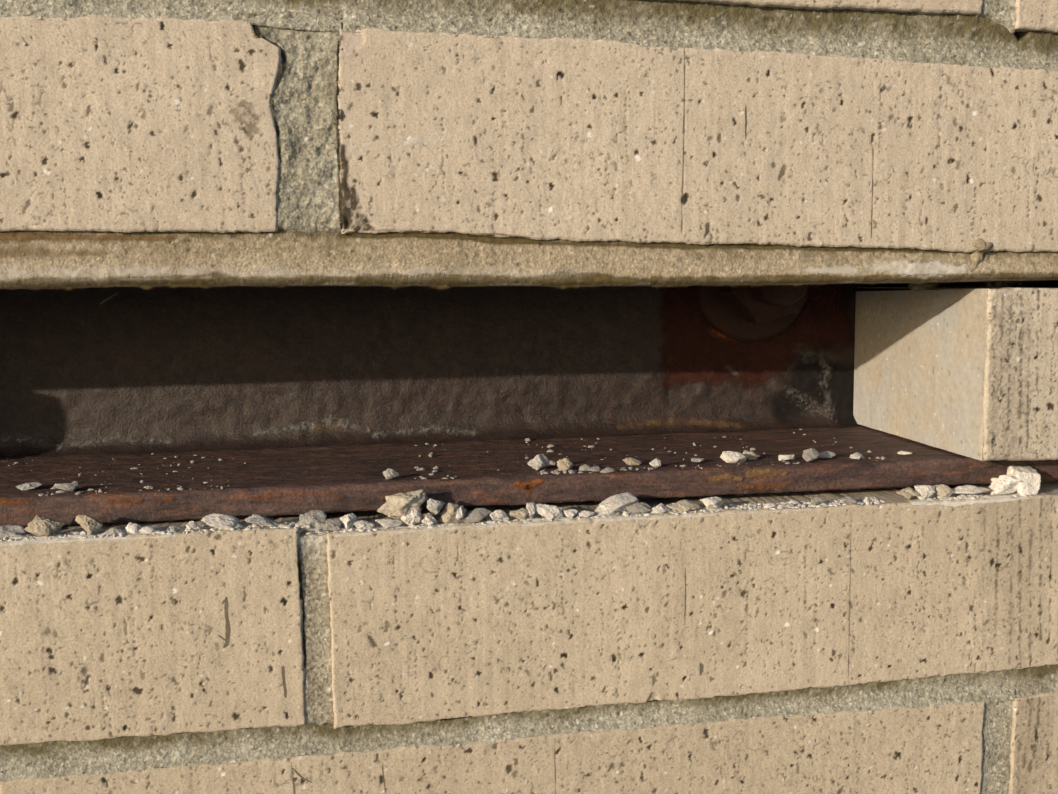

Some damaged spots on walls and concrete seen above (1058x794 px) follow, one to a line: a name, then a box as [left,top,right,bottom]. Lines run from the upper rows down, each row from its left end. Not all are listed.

peeling [16,482,80,491]
corrosion [710,468,793,489]